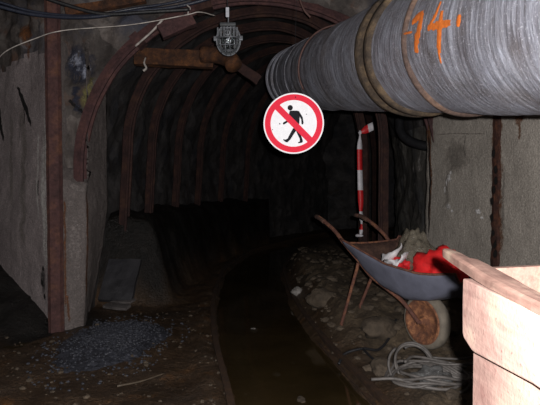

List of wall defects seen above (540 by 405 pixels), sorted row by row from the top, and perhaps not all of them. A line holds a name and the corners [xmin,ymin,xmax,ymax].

crack [17,87,31,125]
water stain [68,46,94,112]
corrosion [490,163,503,258]